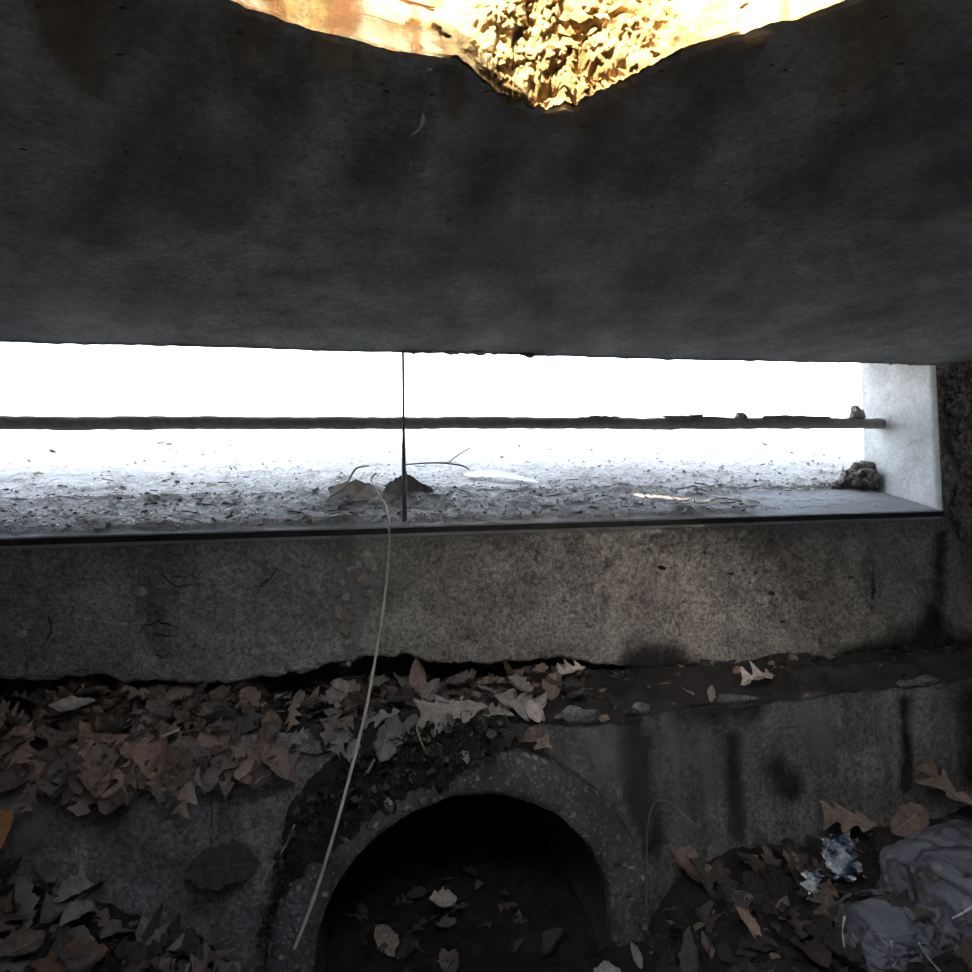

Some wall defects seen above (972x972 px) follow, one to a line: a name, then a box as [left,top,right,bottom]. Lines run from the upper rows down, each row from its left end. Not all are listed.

corrosion [328,0,360,35]
spalling [426,0,747,110]
leakage [584,712,661,855]
leakage [680,699,763,720]
leakage [726,731,745,843]
leakage [766,757,803,801]
leakage [900,697,913,793]